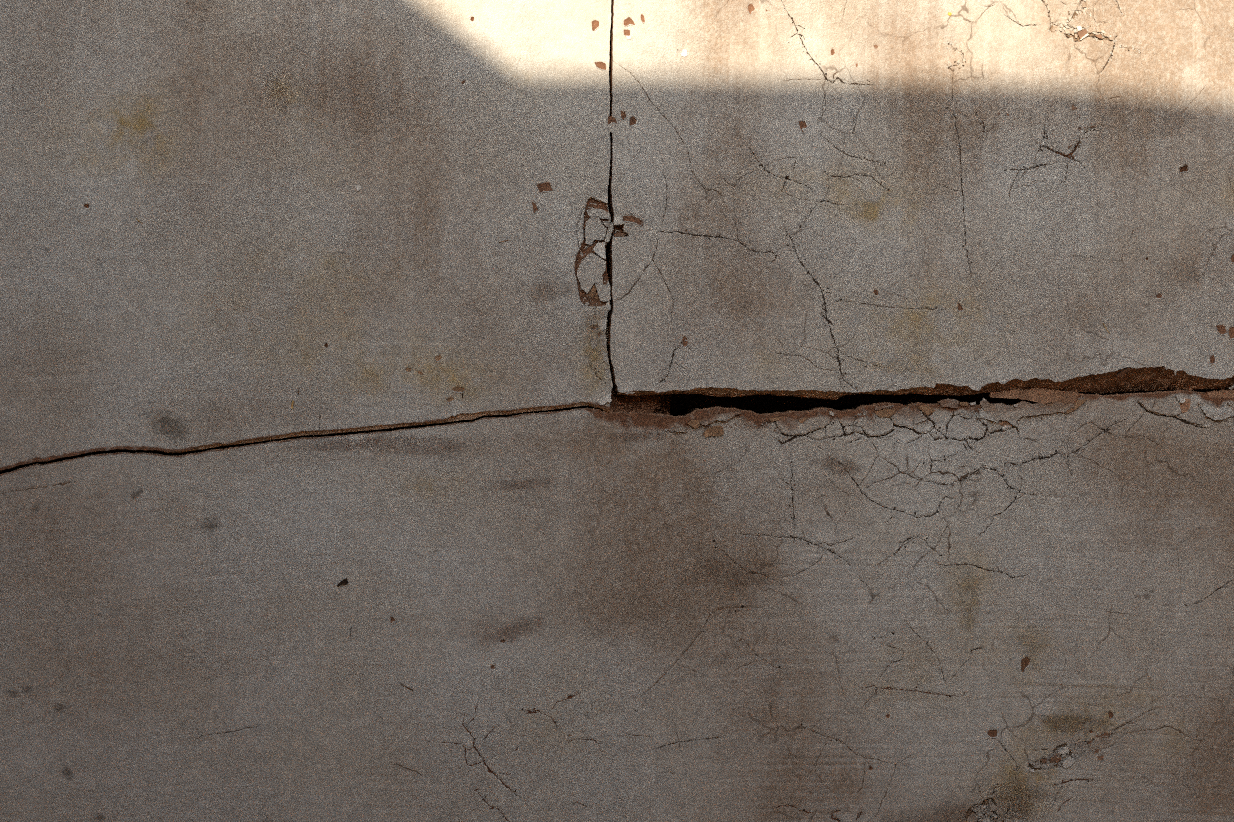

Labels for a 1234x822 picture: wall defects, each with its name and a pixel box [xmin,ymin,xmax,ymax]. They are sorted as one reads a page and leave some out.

peeling [575,193,643,380]
crack [0,0,1234,586]
crack [442,693,600,822]
crack [626,605,783,775]
crack [771,723,911,822]
crack [861,623,980,709]
spalling [965,783,1010,822]
crack [986,738,1020,791]
crack [1052,777,1093,811]
spalling [1017,711,1137,772]
crack [1111,709,1234,746]